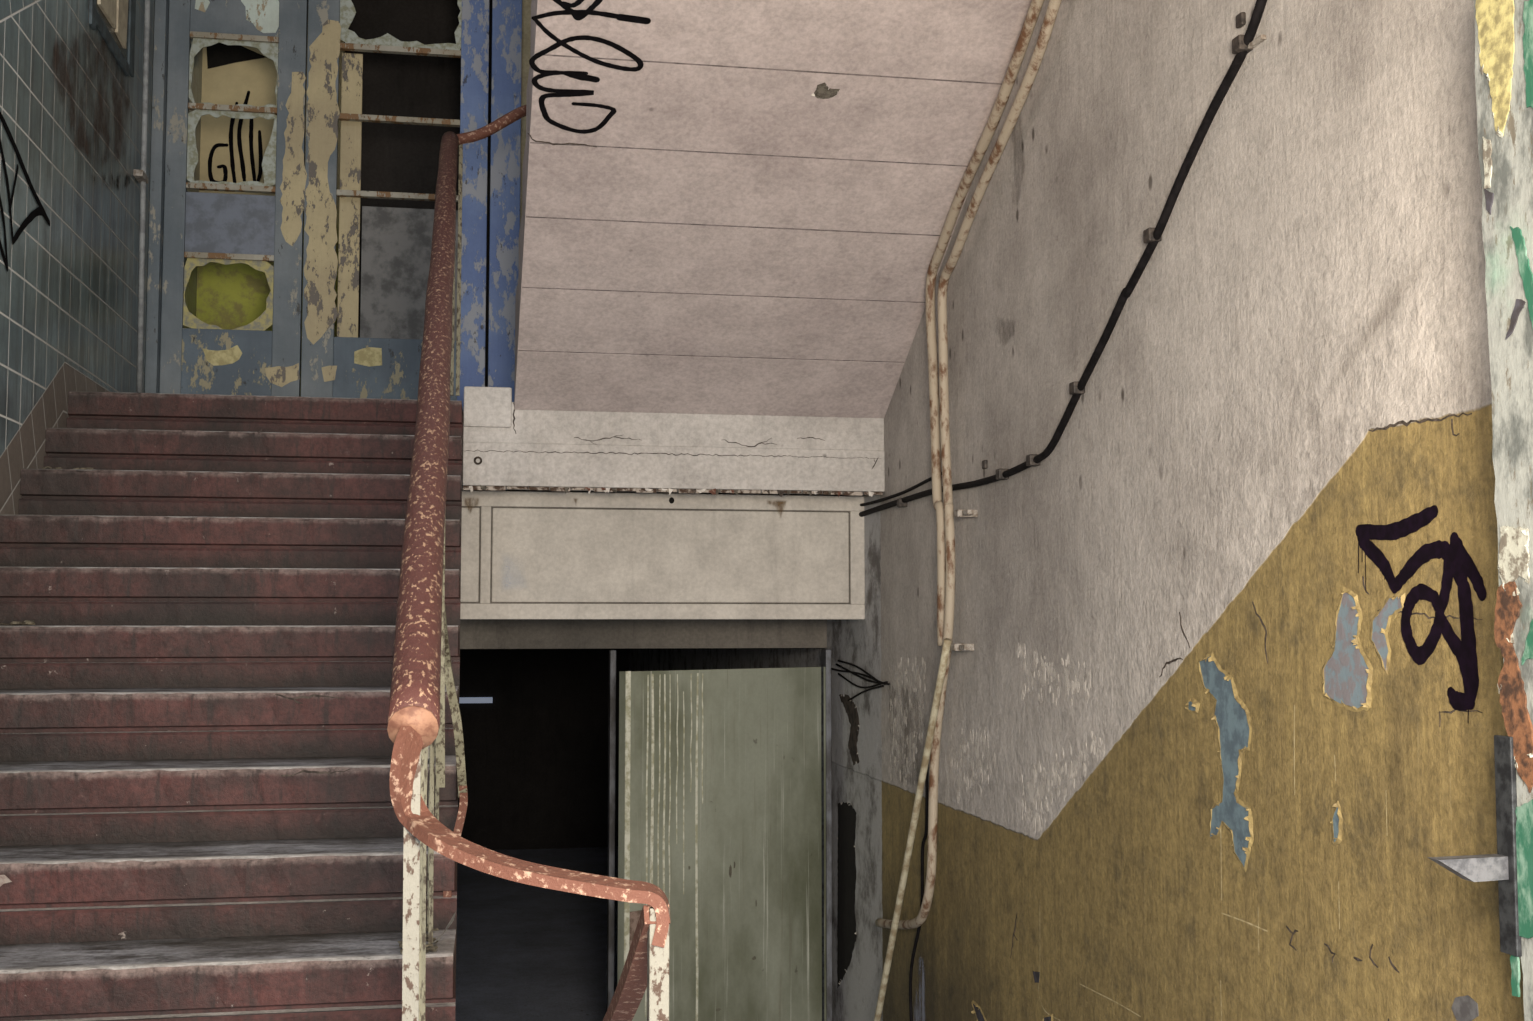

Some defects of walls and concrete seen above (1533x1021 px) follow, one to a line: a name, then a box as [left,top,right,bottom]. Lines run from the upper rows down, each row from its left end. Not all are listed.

peeling [1475,0,1515,215]
peeling [1506,299,1526,339]
peeling [1185,652,1254,872]
peeling [1322,586,1405,712]
peeling [1497,526,1530,596]
rust [1494,582,1533,793]